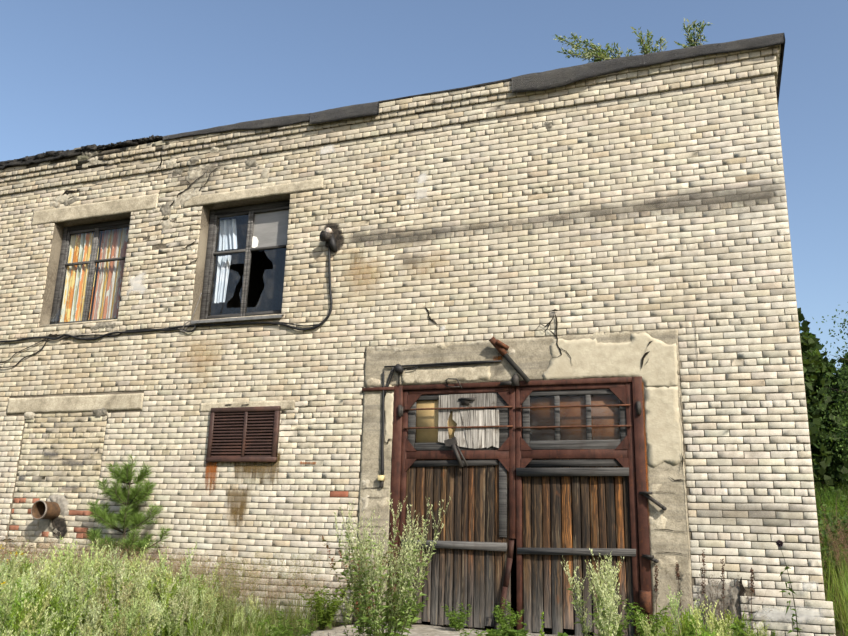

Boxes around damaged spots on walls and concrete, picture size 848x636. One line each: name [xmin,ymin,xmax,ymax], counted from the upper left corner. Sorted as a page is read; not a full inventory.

crack [157,168,218,225]
crack [531,309,573,366]
peeling [543,331,685,467]
rust [206,453,280,490]
rust [228,489,248,521]